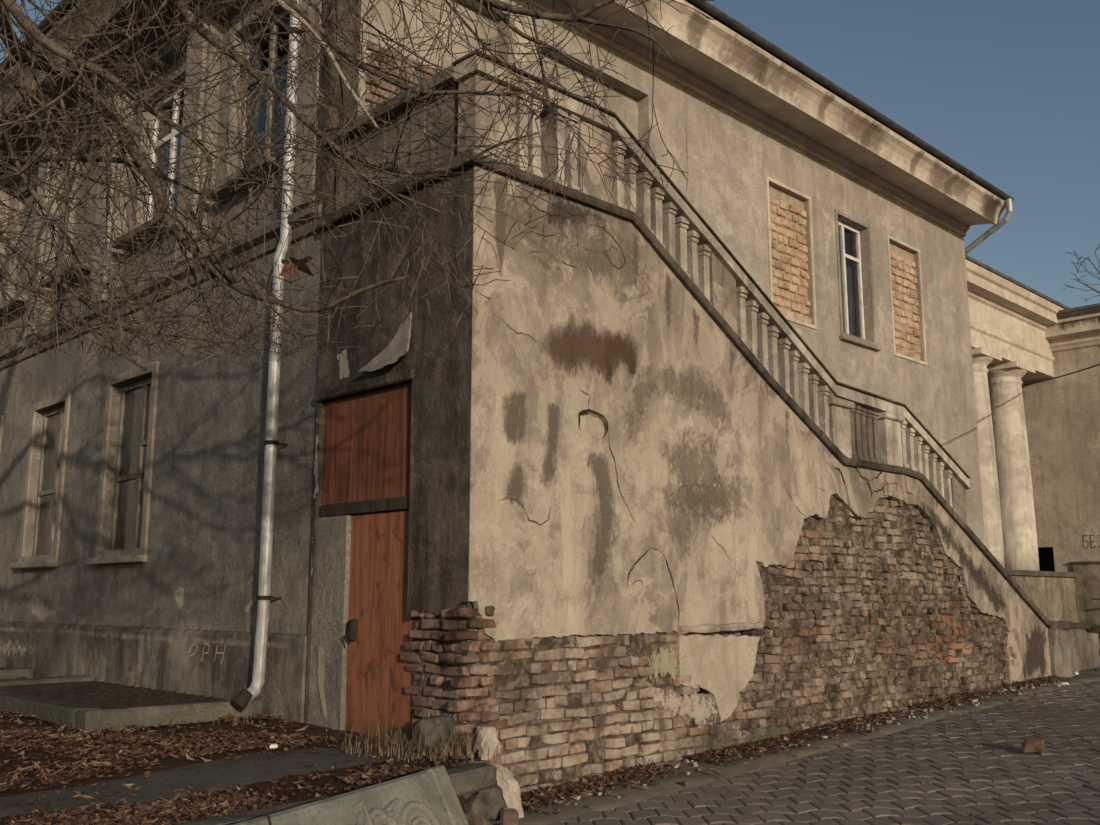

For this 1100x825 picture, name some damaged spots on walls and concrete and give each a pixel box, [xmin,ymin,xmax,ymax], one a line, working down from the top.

leakage [689,10,708,49]
leakage [724,43,804,95]
leakage [843,112,885,151]
peeling [337,312,412,379]
leakage [504,393,526,443]
spalling [578,390,609,450]
leakage [484,404,575,592]
leakage [588,454,615,582]
crack [609,442,634,519]
leakage [626,367,741,555]
crack [627,547,680,624]
spalling [397,467,1016,794]